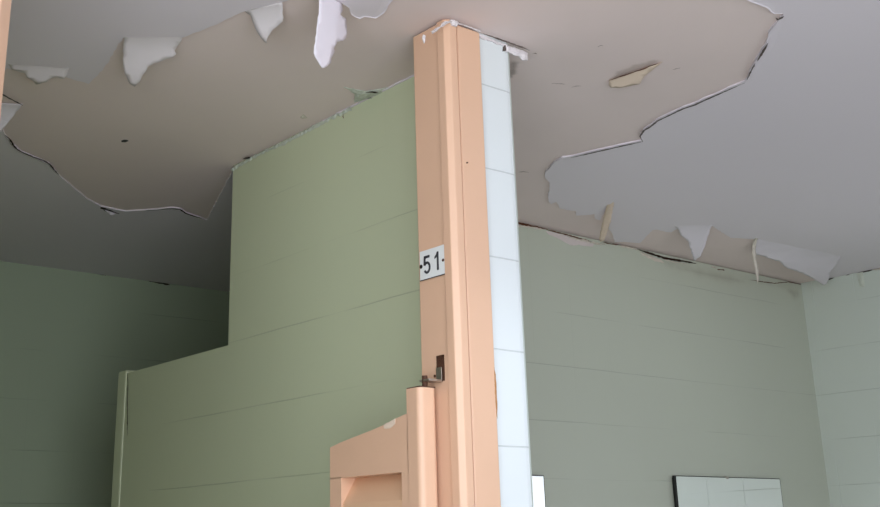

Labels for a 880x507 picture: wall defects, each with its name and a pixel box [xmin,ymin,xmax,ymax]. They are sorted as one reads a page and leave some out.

peeling [0,0,840,285]